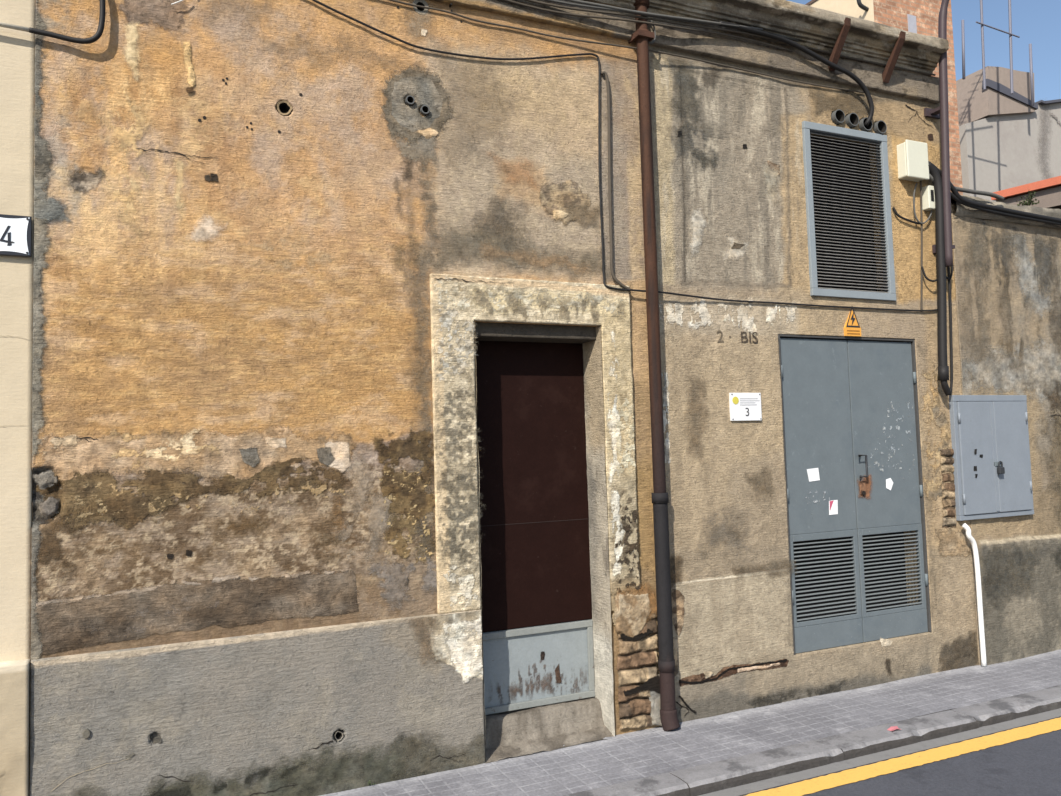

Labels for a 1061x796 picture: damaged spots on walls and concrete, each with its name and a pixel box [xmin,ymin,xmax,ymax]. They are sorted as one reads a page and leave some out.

crack [135,148,216,164]
water stain [669,60,717,165]
water stain [690,210,706,254]
water stain [727,237,747,258]
water stain [965,223,1061,364]
peeling [32,426,356,575]
spalling [373,429,483,682]
flaking render [606,395,662,730]
peeling [671,589,685,676]
corrosion [498,664,579,699]
crack [676,659,789,716]
water stain [149,735,485,796]